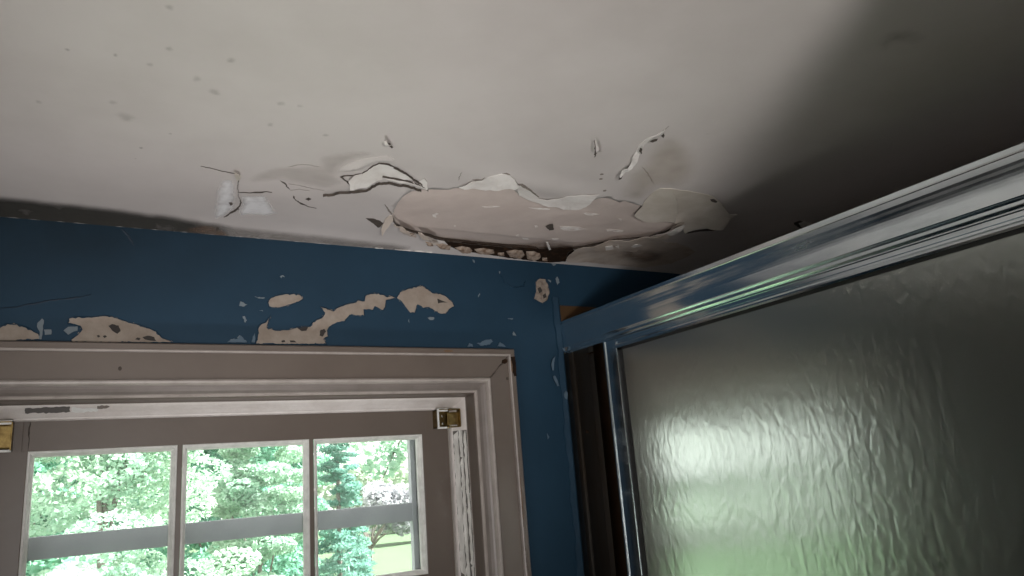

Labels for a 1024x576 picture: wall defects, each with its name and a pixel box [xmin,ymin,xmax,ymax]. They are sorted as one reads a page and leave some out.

flaking render [366,172,695,304]
peeling [0,315,174,343]
peeling [239,285,454,345]